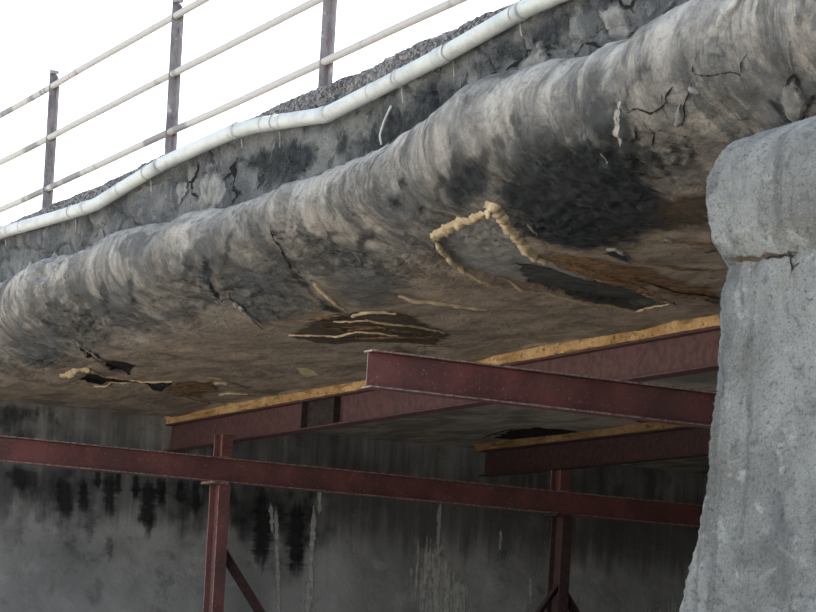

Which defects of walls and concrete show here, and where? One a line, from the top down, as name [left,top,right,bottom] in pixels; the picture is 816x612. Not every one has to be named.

crack [602,0,635,14]
crack [491,38,550,74]
crack [661,52,747,125]
crack [785,73,815,120]
damp [434,97,737,320]
spalling [430,201,675,313]
crack [705,251,800,275]
flaking render [209,272,448,345]
spalling [60,337,239,398]
damp [6,466,121,515]
damp [132,475,166,531]
damp [230,486,323,612]